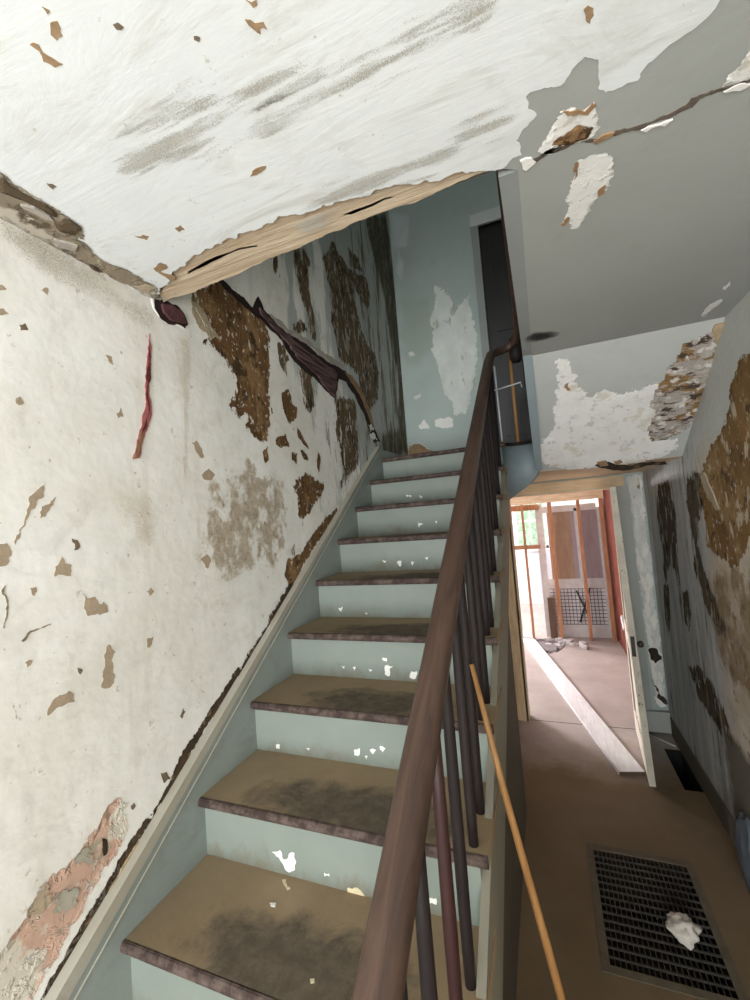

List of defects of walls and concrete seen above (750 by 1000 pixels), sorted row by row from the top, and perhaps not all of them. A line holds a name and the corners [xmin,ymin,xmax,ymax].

crack [520,79,750,171]
peeling [0,0,720,519]
flaking render [698,354,750,569]
flaking render [0,485,55,567]
flaking render [54,557,72,577]
flaking render [83,594,108,616]
flaking render [284,508,337,585]
flaking render [540,322,724,707]
flaking render [47,691,75,716]
flaking render [101,644,115,689]
flaking render [689,664,733,745]
flaking render [0,798,136,1000]